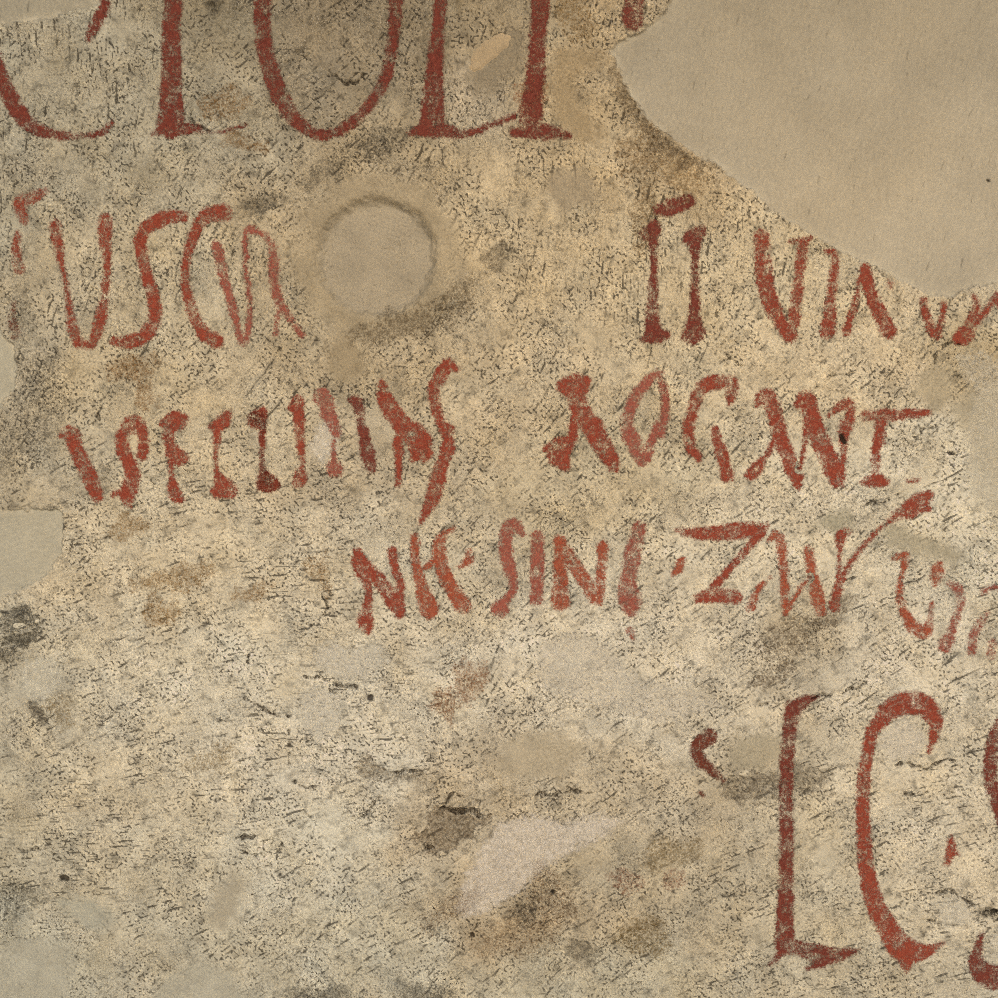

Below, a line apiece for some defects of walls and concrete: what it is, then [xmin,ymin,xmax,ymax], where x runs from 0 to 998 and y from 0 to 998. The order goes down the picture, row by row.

spalling [0,606,42,648]